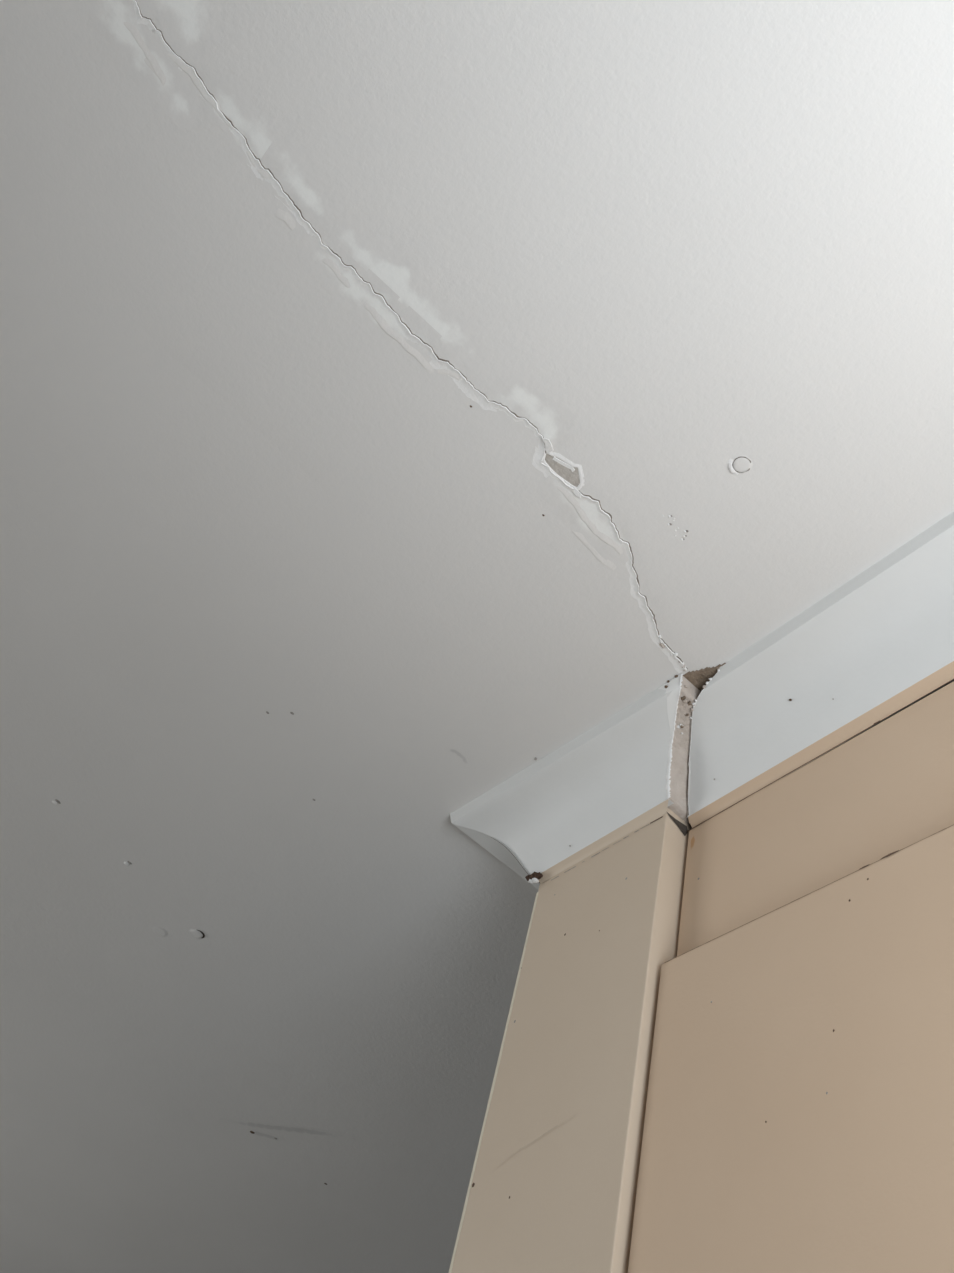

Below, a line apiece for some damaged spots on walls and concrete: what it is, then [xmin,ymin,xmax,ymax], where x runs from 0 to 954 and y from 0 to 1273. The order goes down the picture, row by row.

crack [132,0,954,884]